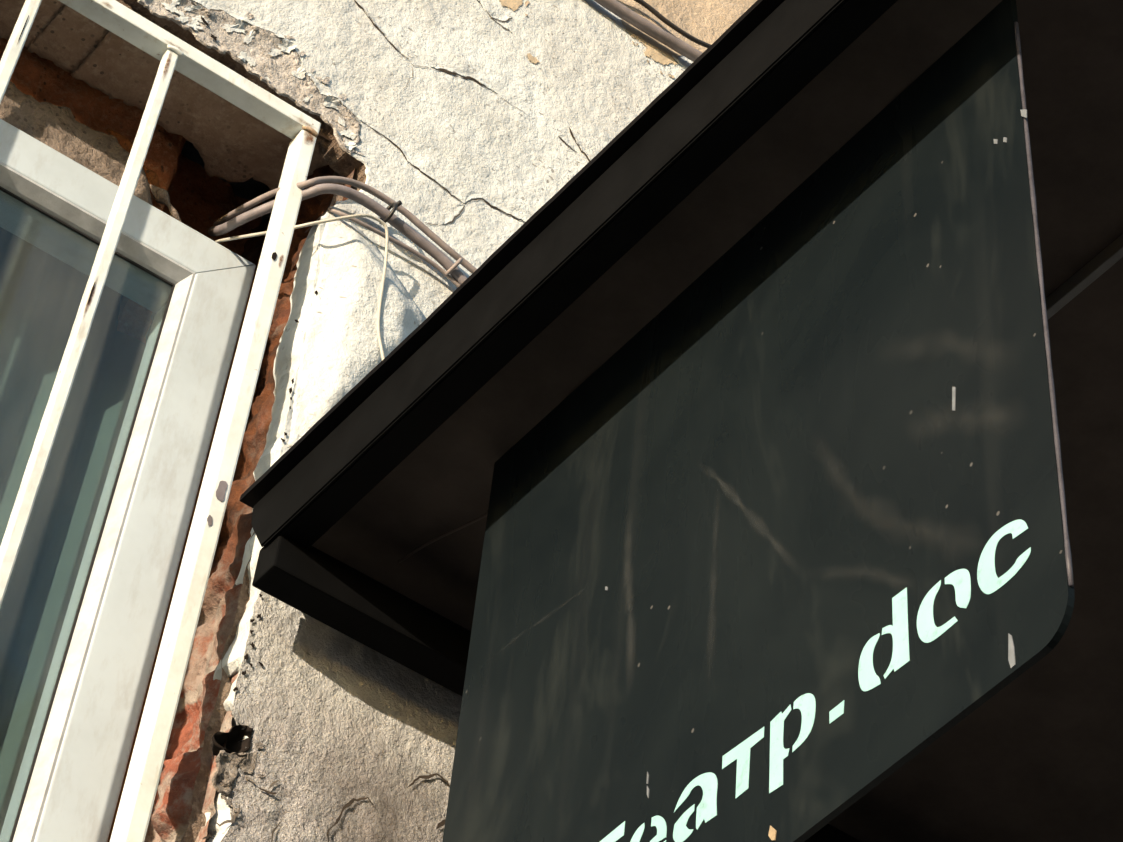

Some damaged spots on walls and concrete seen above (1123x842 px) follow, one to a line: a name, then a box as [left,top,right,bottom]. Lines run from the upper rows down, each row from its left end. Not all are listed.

peeling [500,0,530,16]
flaking render [137,0,365,155]
crack [190,0,530,225]
spalling [233,614,264,692]
flaking render [211,725,265,817]
crack [327,797,374,842]
crack [407,773,450,788]